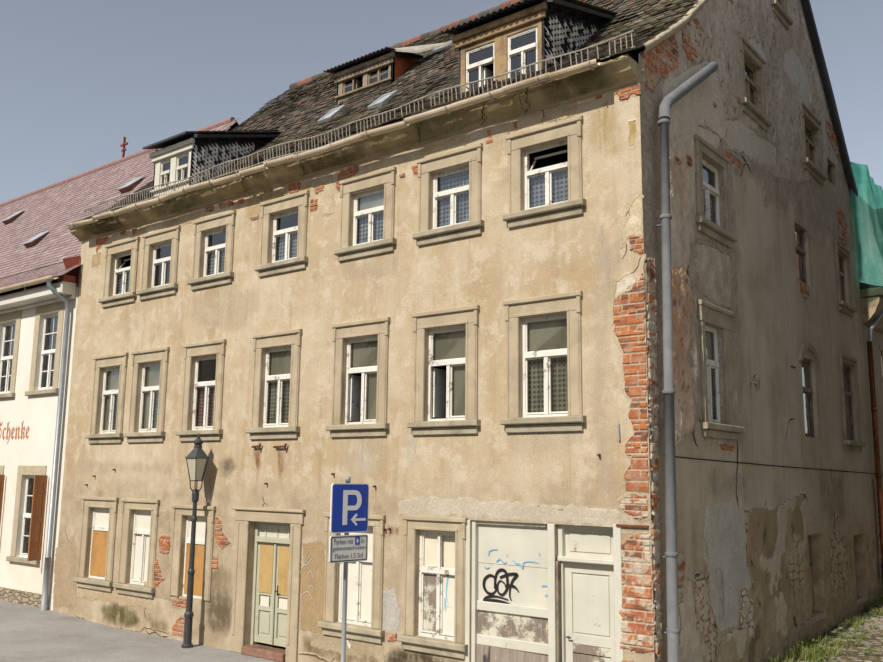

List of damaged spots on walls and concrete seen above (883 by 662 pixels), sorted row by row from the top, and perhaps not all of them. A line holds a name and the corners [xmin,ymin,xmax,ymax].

flaking render [616,0,841,184]
flaking render [669,120,732,447]
flaking render [611,195,663,662]
flaking render [153,534,172,588]
flaking render [171,596,193,639]
flaking render [211,516,233,572]
damp [389,651,437,662]
flaking render [677,491,809,662]